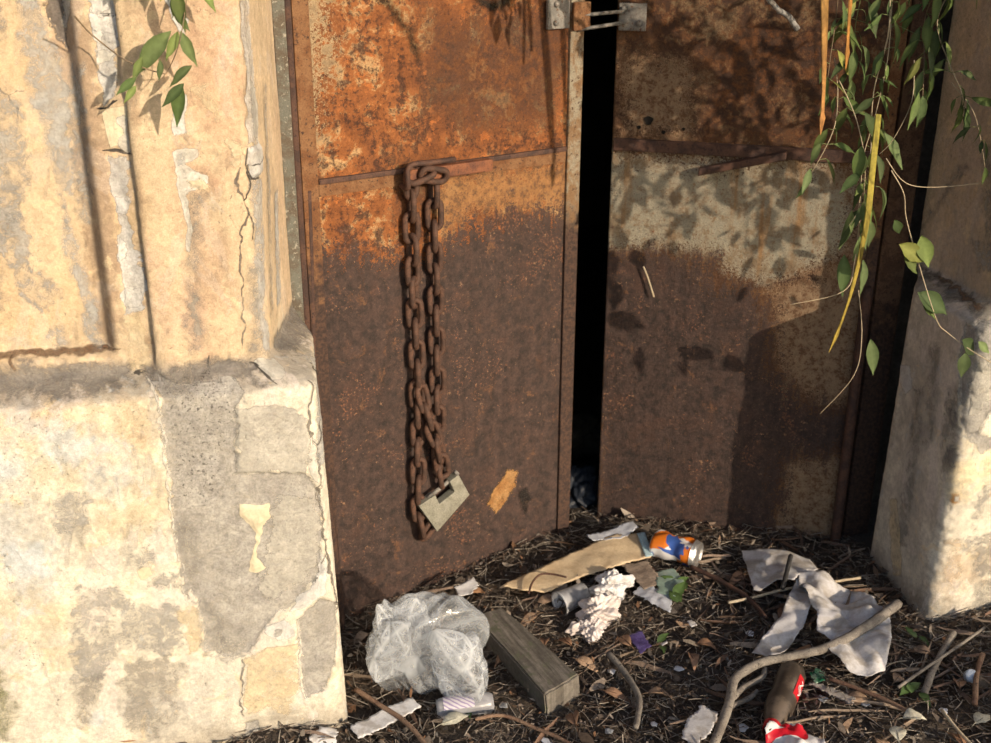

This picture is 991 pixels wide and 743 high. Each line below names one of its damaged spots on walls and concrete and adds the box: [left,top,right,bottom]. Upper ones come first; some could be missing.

crack [234,165,254,345]
flaking render [88,0,337,736]
flaking render [942,319,991,471]
corrosion [487,469,531,514]